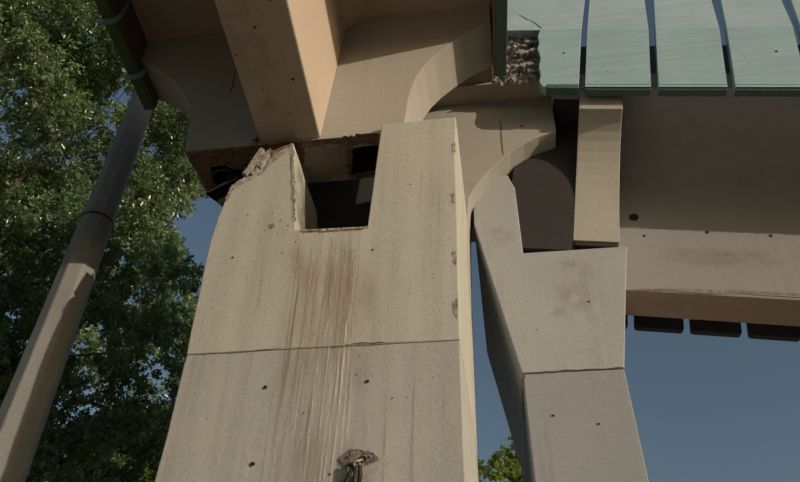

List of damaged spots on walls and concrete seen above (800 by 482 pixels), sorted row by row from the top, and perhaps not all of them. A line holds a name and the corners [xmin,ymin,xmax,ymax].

spalling [492,36,540,86]
peeling [211,133,379,231]
crack [333,340,411,348]
crack [521,367,623,390]